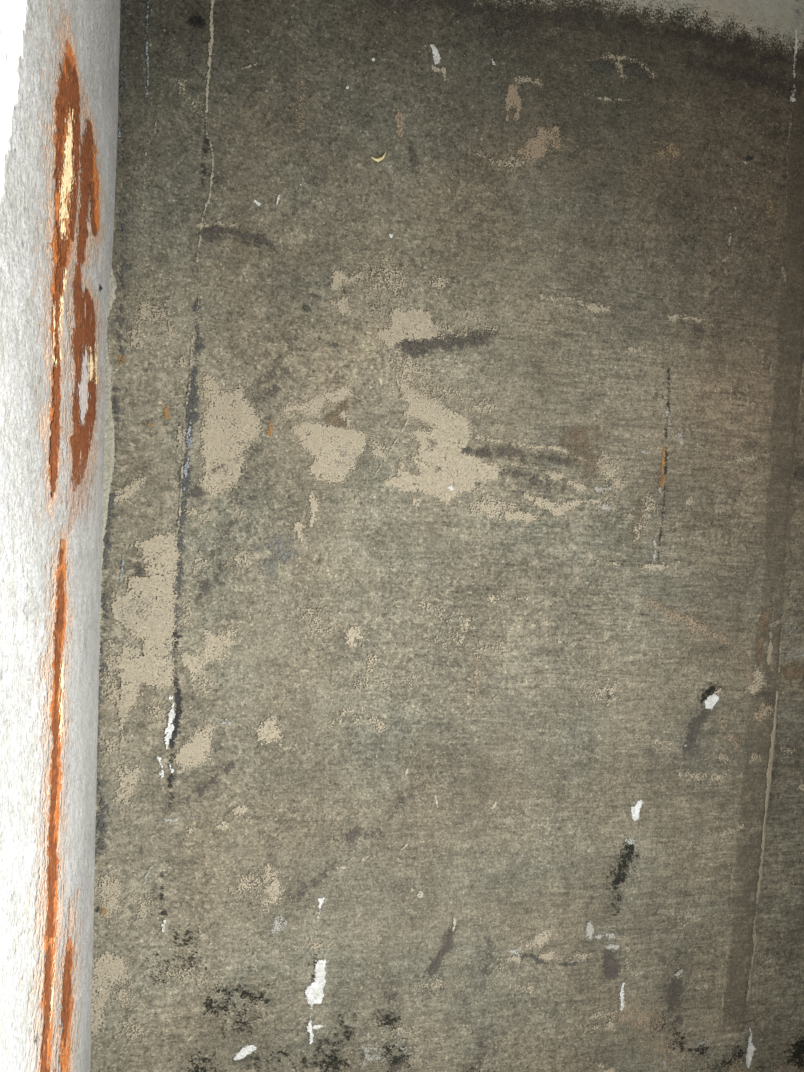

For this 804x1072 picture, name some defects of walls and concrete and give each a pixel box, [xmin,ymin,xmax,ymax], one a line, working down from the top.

damp [378,0,804,102]
corrosion [19,0,127,1072]
crack [95,0,228,863]
peeling [184,373,263,524]
peeling [277,381,392,547]
peeling [303,257,662,544]
peeling [97,526,261,815]
peeling [94,871,157,927]
crack [160,870,168,932]
damp [143,924,207,986]
damp [200,977,272,1038]
damp [247,1005,358,1072]